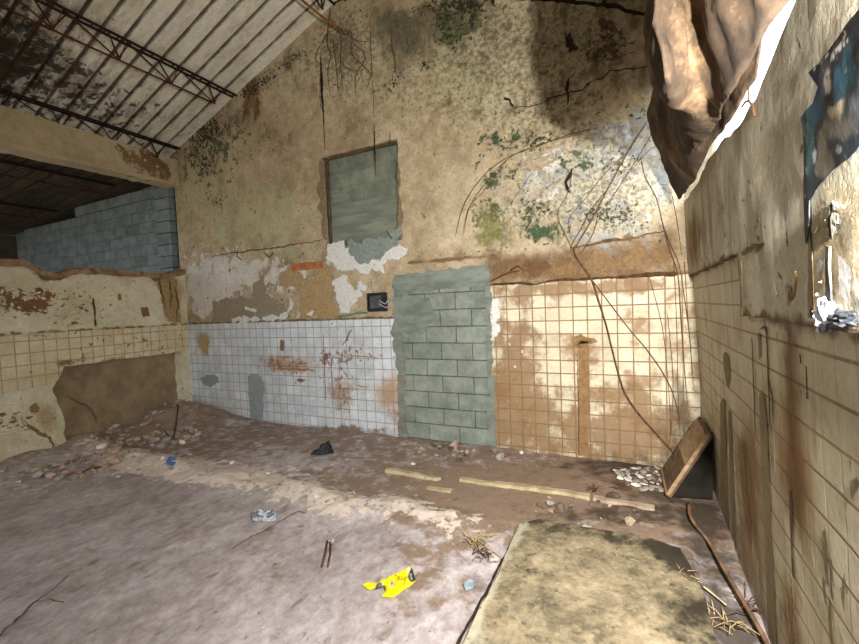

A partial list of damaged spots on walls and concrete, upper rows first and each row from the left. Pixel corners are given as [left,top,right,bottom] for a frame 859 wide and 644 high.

crack [520,0,645,16]
leakage [373,0,486,100]
crack [504,66,647,108]
leakage [171,115,228,176]
peeling [212,158,408,323]
peeling [807,173,859,318]
leakage [785,590,798,644]